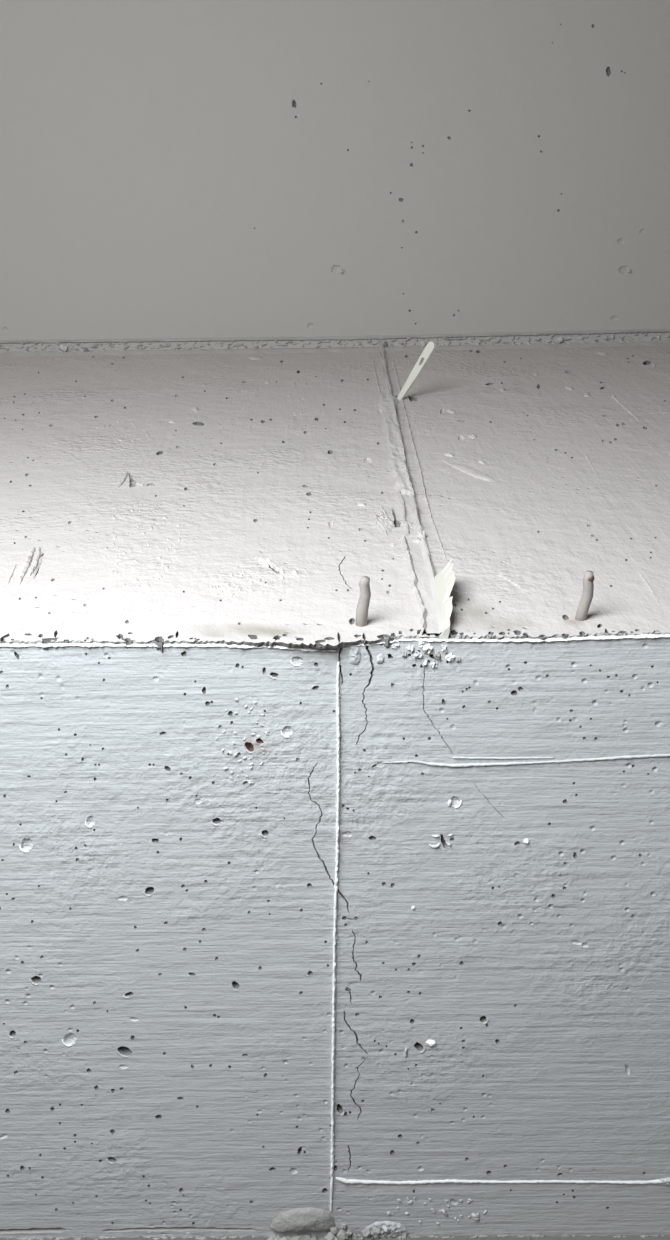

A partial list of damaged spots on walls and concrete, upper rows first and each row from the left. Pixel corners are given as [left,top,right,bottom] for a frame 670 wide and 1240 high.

crack [338,646,374,744]
crack [308,764,368,1170]